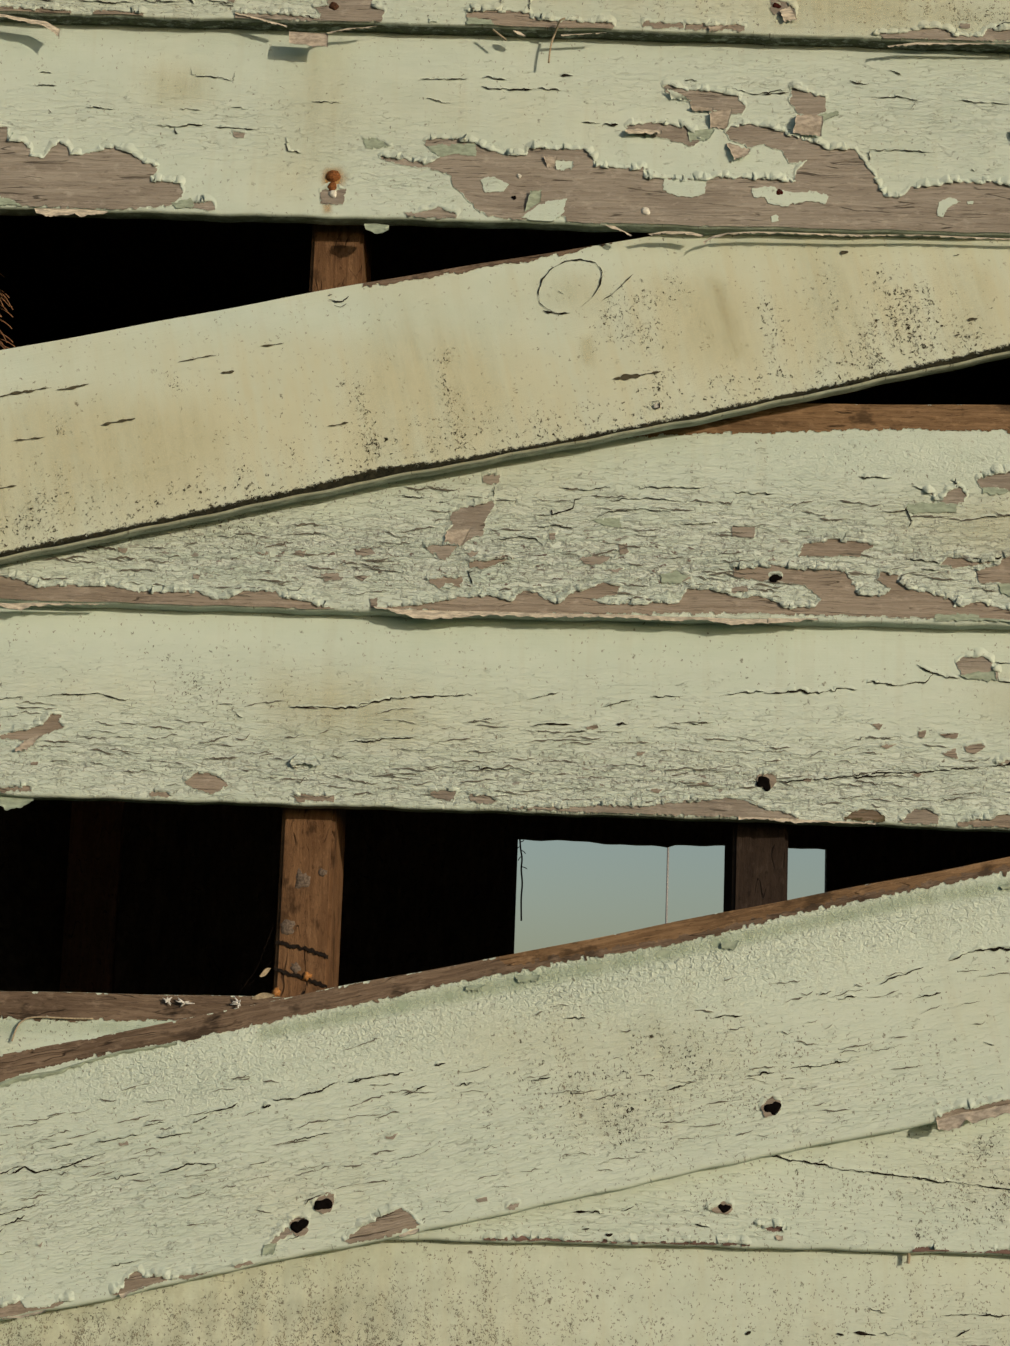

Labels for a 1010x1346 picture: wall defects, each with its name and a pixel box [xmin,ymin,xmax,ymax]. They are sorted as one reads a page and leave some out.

peeling [227,0,387,47]
peeling [0,121,217,217]
peeling [361,79,1010,244]
peeling [0,541,377,611]
peeling [368,463,1010,625]
crack [0,660,1010,813]
peeling [427,777,1010,828]
crack [441,941,1010,1212]
crack [0,1035,490,1255]
crack [573,1205,634,1237]
crack [837,1307,895,1336]
crack [942,1312,1010,1337]